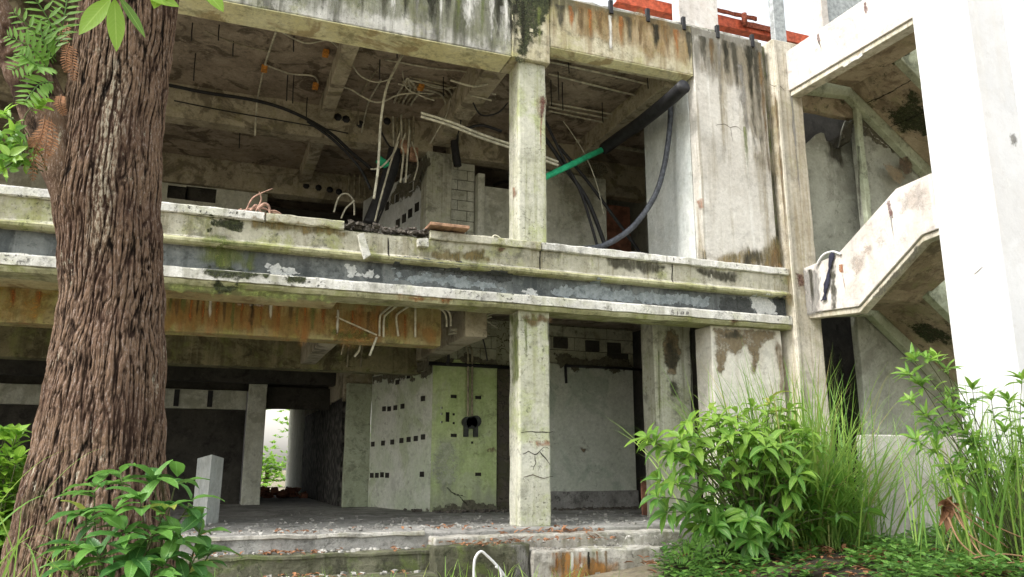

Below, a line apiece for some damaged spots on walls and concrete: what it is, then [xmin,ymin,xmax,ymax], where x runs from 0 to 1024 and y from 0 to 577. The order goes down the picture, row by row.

water stain [383,0,551,63]
rust [556,5,602,31]
rust [619,17,692,57]
water stain [699,36,786,223]
peeling [265,263,300,277]
peeling [344,264,380,279]
water stain [697,238,782,282]
rust [165,298,437,342]
water stain [658,329,693,413]
water stain [713,328,785,394]
crack [521,431,553,479]
rust [552,551,617,577]